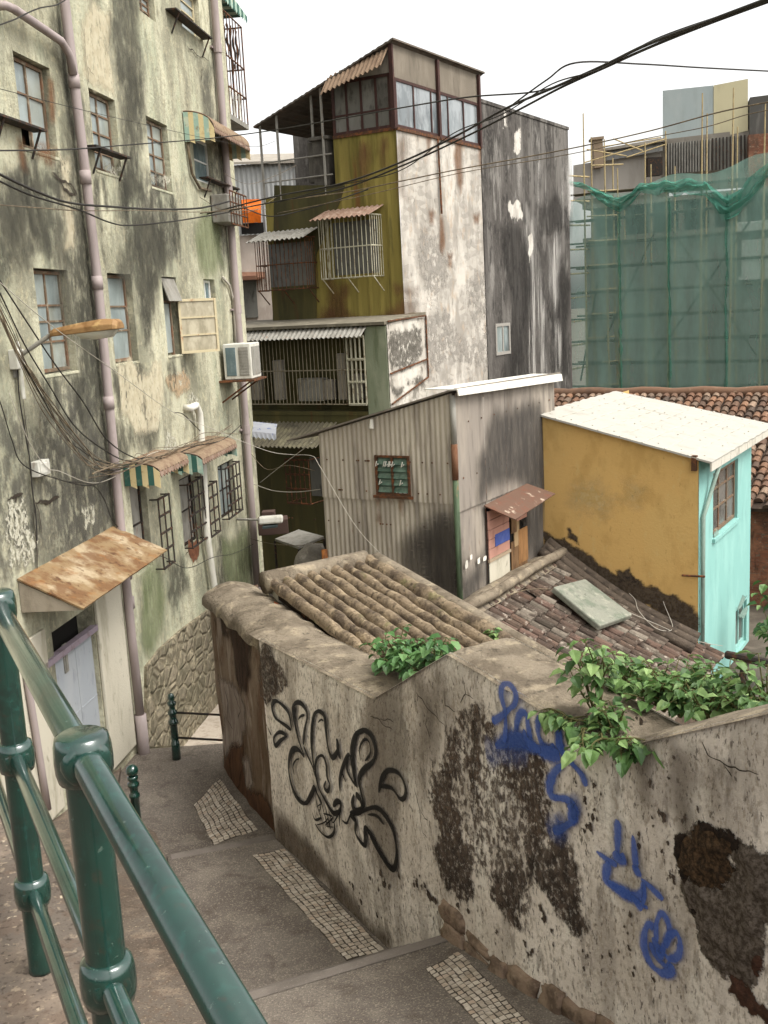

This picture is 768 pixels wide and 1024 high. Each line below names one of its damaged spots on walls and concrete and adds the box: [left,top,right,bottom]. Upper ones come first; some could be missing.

damp [202,67,214,119]
damp [111,0,179,340]
damp [562,156,573,215]
rust [322,287,347,318]
damp [526,220,559,374]
damp [480,403,544,499]
damp [523,502,700,631]
damp [220,618,389,948]
peeling [638,779,666,828]
crack [702,742,759,777]
spalling [660,805,768,1024]